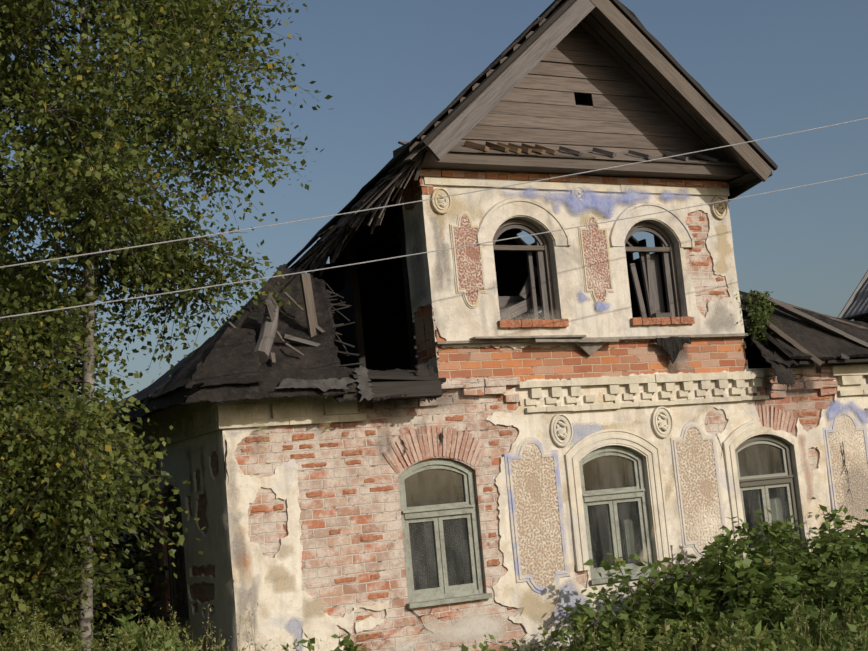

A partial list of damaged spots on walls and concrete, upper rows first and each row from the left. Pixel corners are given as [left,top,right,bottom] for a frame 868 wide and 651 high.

spalling [683,210,729,317]
spalling [753,366,838,437]
spalling [234,305,747,651]
crack [841,442,853,499]
spalling [106,448,215,639]